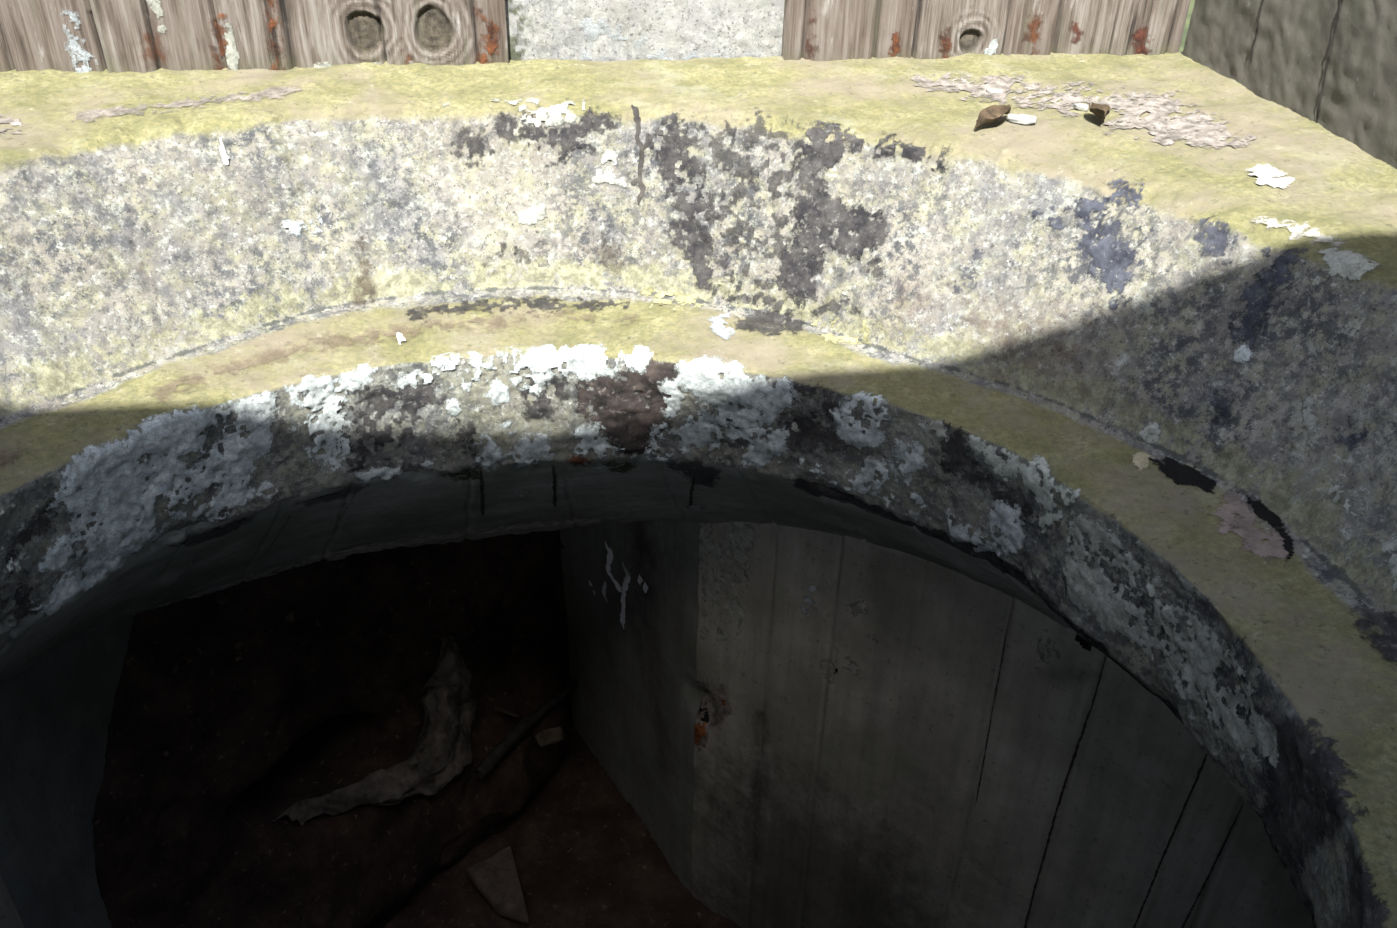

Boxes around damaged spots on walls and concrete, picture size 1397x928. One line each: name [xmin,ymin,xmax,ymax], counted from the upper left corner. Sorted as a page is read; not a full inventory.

rust [210,13,227,70]
rust [1024,14,1041,55]
rust [1132,27,1149,55]
damp [451,106,622,168]
damp [647,107,950,336]
damp [1025,179,1157,311]
damp [442,414,483,482]
damp [518,353,721,488]
crack [478,469,486,516]
crack [550,465,558,507]